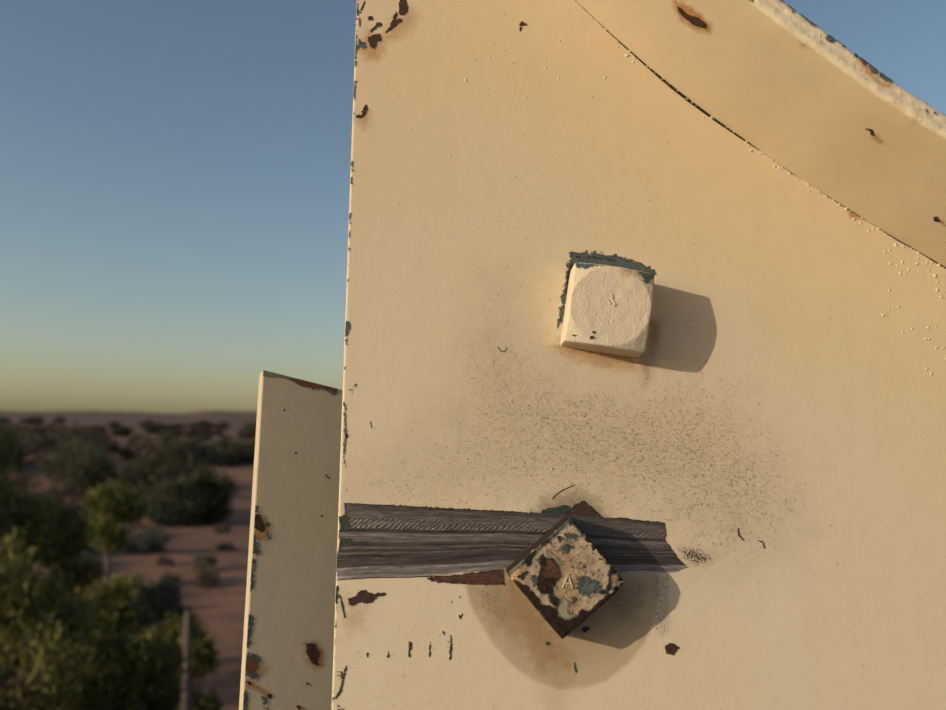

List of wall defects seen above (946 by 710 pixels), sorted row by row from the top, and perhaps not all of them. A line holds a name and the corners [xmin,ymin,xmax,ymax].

peeling [355,0,409,66]
corrosion [675,2,709,32]
peeling [780,0,893,86]
peeling [557,250,656,329]
corrosion [253,506,272,556]
peeling [336,585,386,606]
corrosion [426,536,622,638]
corrosion [245,652,272,705]
corrosion [306,643,322,666]
peeling [665,643,680,655]